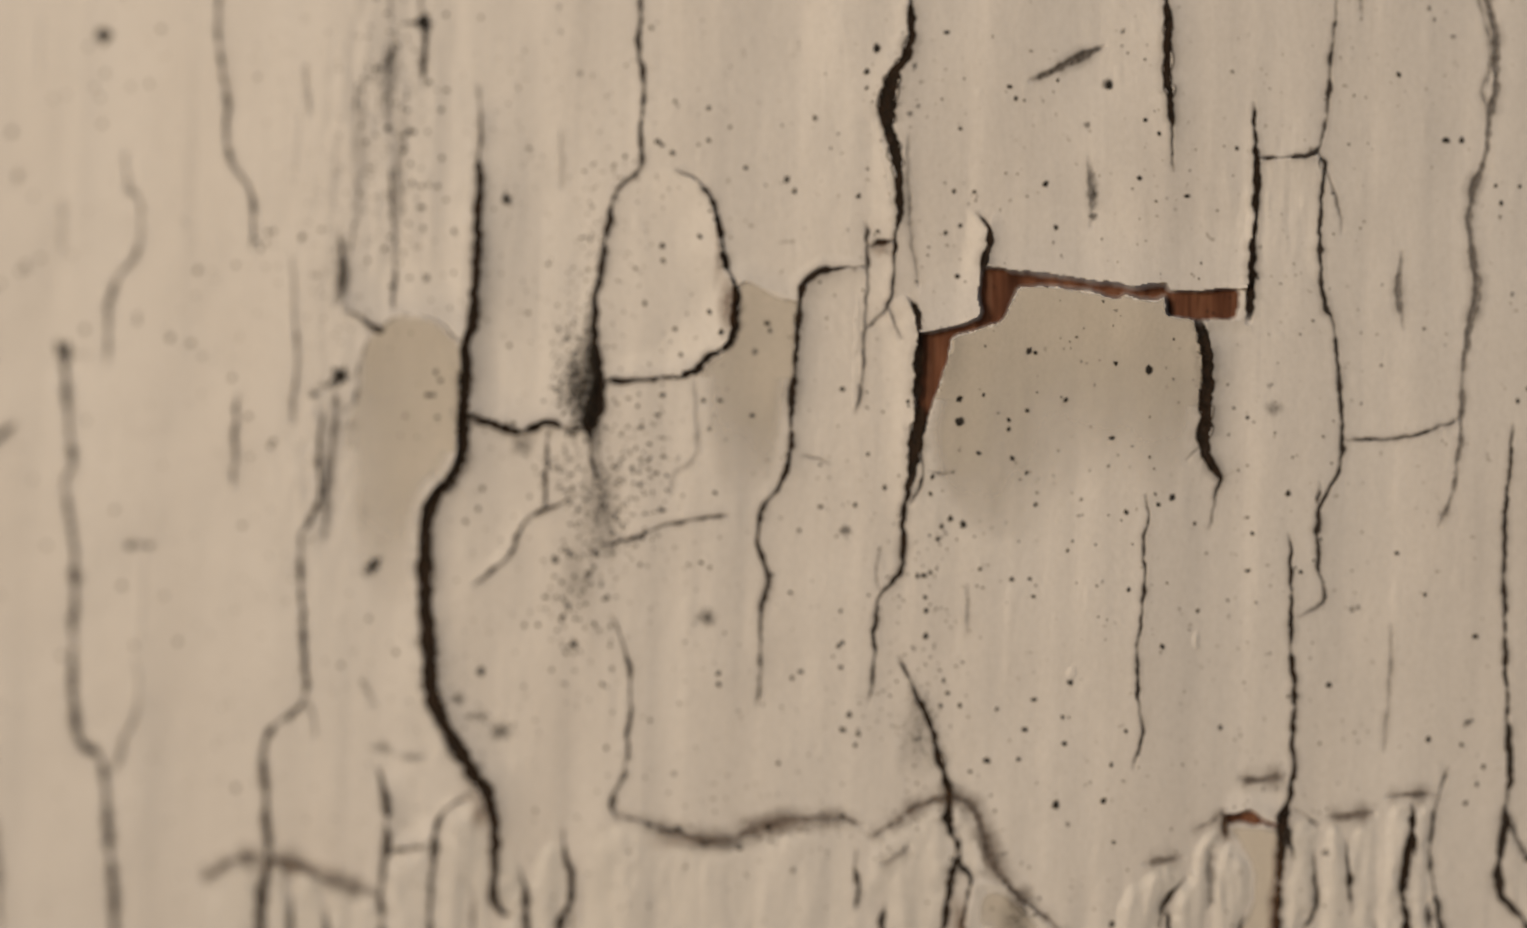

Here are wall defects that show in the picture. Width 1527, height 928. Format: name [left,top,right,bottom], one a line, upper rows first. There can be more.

peeling [871,95,895,204]
crack [62,361,136,928]
crack [210,0,742,928]
peeling [301,151,1323,850]
crack [604,0,1056,928]
peeling [1224,782,1287,928]
crack [1152,0,1500,928]
crack [1492,430,1527,928]
peeling [1501,824,1527,920]